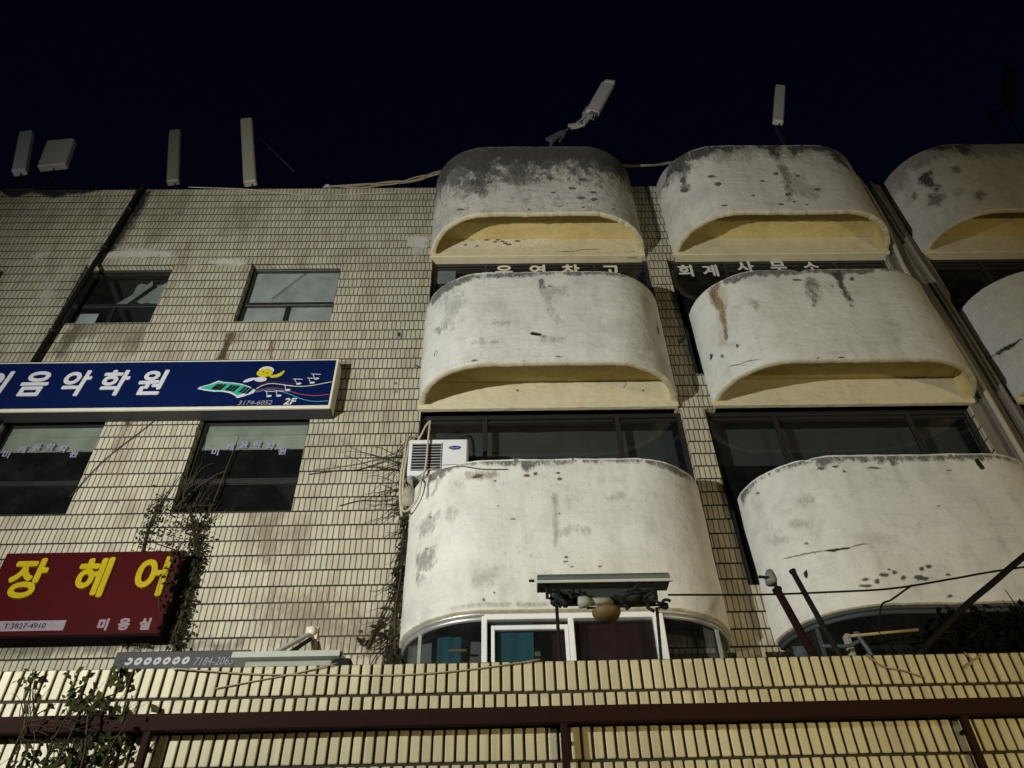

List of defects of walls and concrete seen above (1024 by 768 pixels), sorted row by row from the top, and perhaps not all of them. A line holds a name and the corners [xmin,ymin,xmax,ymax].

mould [438,146,625,196]
leakage [662,145,851,193]
mould [914,171,942,206]
leakage [722,269,894,306]
rust [710,283,728,340]
crack [989,339,1022,360]
crack [783,543,865,559]
spalling [859,565,931,587]